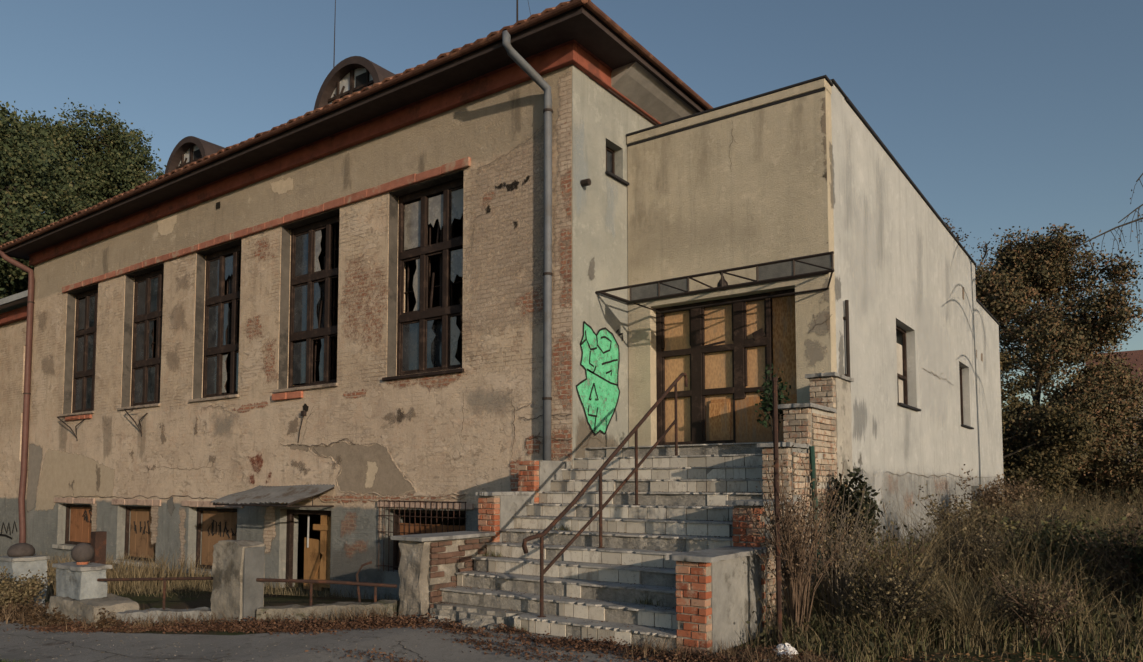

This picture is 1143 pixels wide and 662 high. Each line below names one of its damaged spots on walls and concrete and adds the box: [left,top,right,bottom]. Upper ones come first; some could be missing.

peeling [270,177,294,194]
peeling [157,212,178,236]
flaking render [467,71,572,491]
flaking render [246,316,279,382]
peeling [804,279,830,365]
flaking render [91,464,100,532]
flaking render [150,497,186,566]
spalling [287,404,466,538]